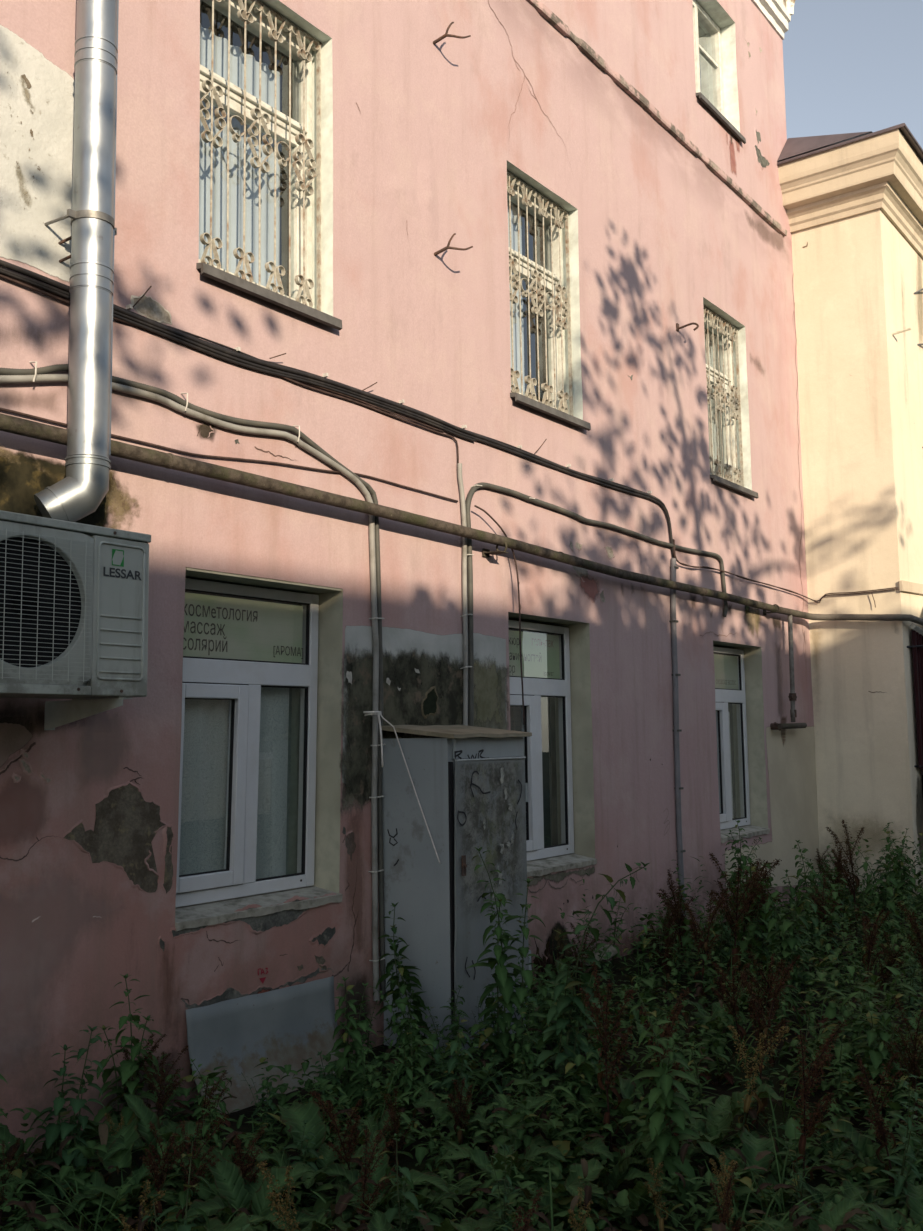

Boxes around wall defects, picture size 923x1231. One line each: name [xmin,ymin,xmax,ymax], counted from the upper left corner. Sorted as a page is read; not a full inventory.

crack [488,0,566,147]
flaking render [62,781,175,895]
flaking render [158,892,337,952]
flaking render [179,926,336,1009]